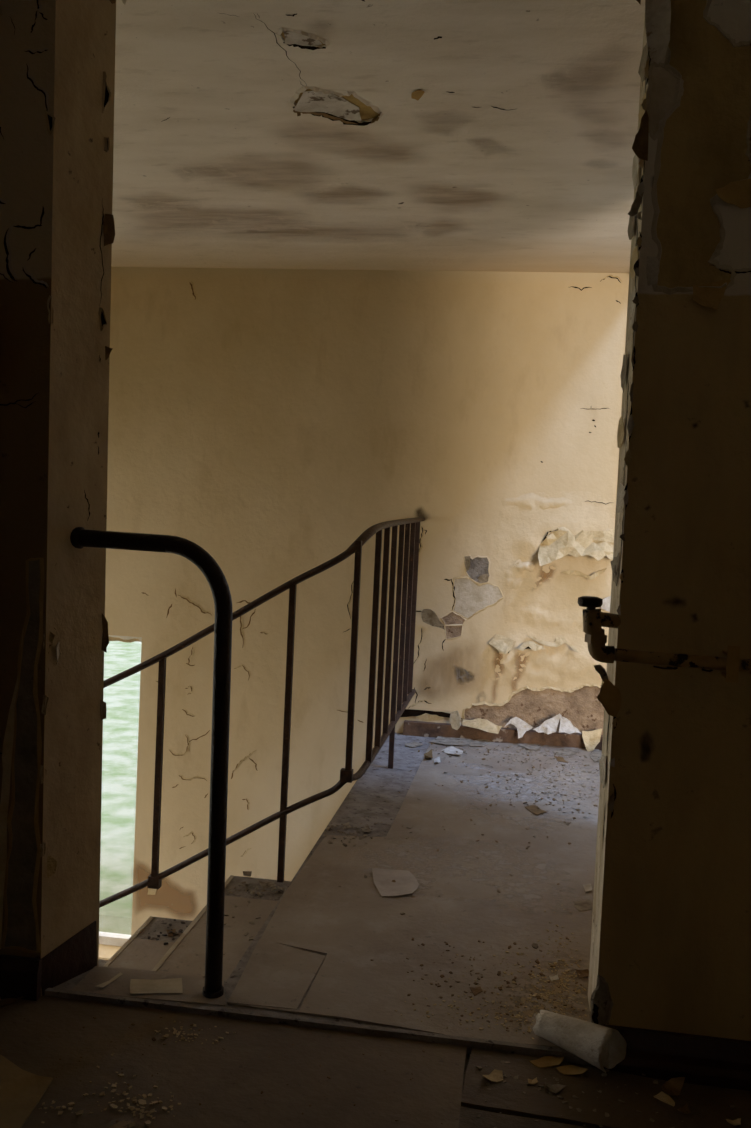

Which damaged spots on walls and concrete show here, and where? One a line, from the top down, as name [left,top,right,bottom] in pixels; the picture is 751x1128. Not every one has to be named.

crack [10,0,51,114]
crack [220,13,307,86]
peeling [275,27,330,50]
peeling [289,85,383,126]
crack [0,198,49,288]
peeling [538,0,751,615]
crack [142,589,269,680]
peeling [421,554,505,640]
peeling [488,634,546,654]
crack [169,647,257,809]
flaking render [401,709,494,755]